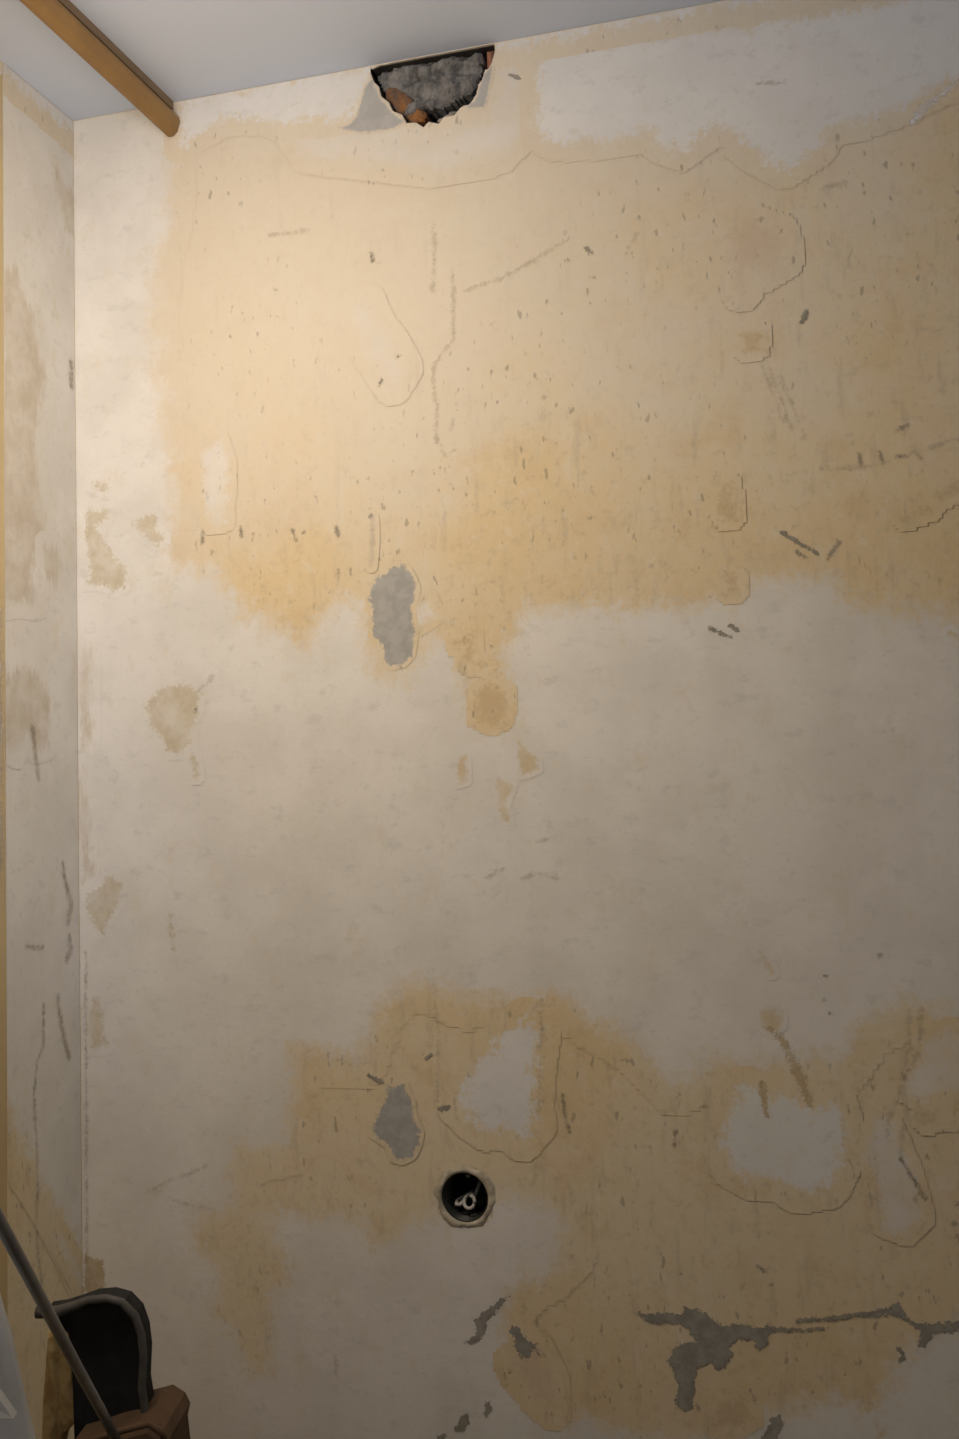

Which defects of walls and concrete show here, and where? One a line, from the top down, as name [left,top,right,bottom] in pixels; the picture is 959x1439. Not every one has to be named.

spalling [336,45,521,134]
damp [445,624,497,680]
peeling [3,95,716,1439]
peeling [409,545,959,1116]
damp [493,1328,572,1432]
peeling [730,1279,959,1439]